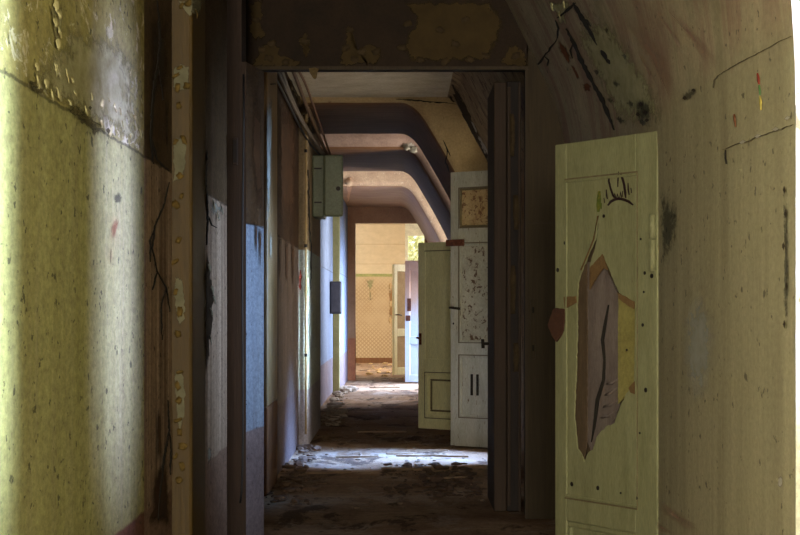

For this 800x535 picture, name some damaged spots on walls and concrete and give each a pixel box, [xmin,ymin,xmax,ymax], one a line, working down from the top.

peeling [30,0,142,139]
peeling [397,1,501,66]
crack [538,2,615,130]
damp [581,17,661,126]
crack [713,36,791,88]
crack [722,116,794,164]
crack [149,182,170,340]
peeling [173,277,186,338]
crack [158,400,172,520]
peeling [173,370,188,484]